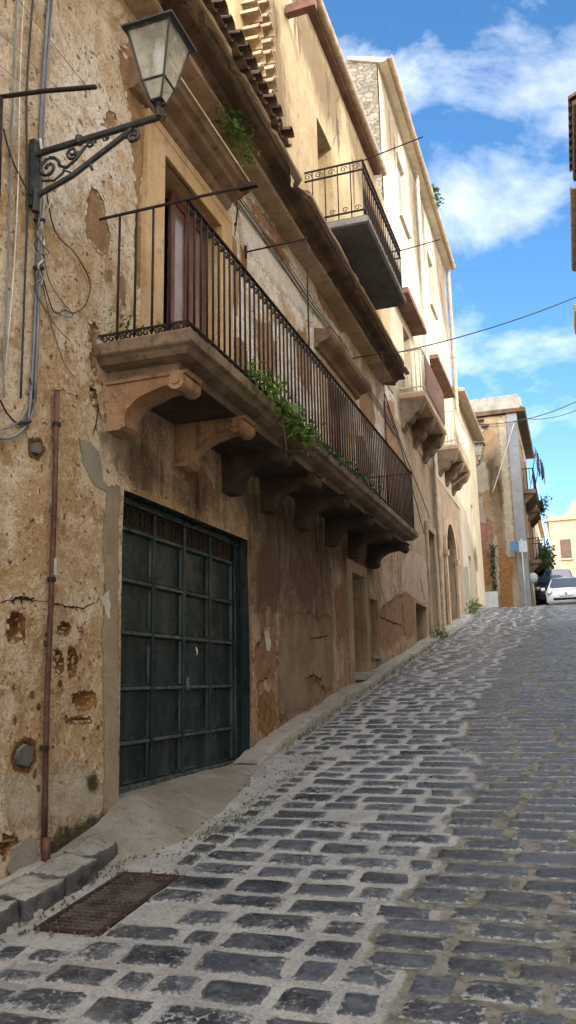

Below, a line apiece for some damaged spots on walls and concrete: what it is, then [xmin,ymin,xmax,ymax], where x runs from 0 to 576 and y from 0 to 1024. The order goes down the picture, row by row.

peeling [84,36,145,306]
spalling [7,610,27,644]
crack [0,593,100,615]
spalling [43,620,100,741]
peeling [252,626,288,738]
flaking render [377,592,416,656]